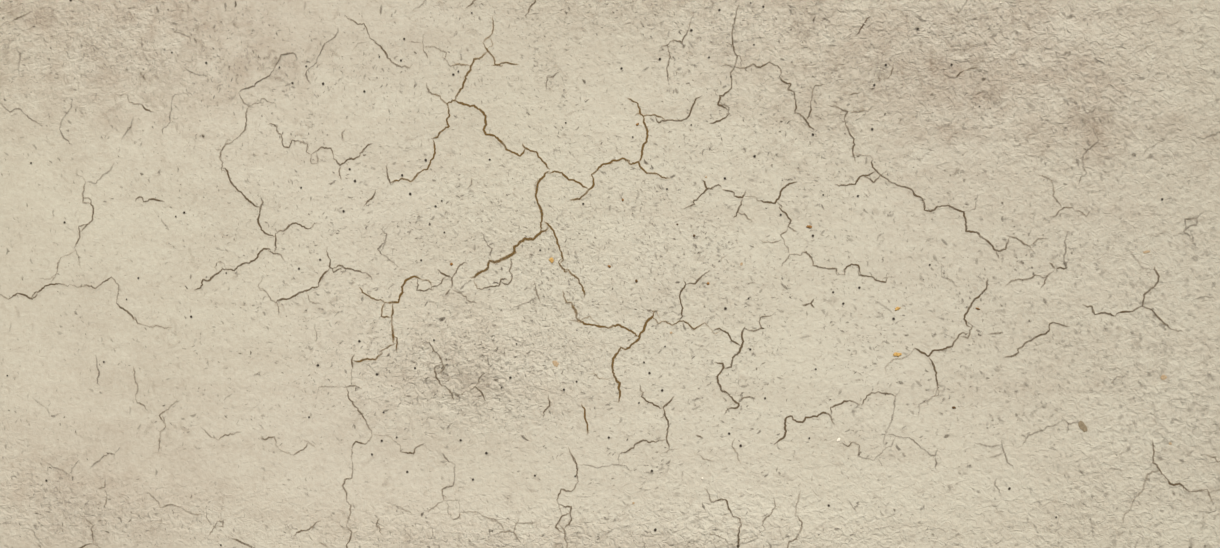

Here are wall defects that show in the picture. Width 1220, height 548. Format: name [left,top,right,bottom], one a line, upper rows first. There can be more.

crack [8,199,139,324]
crack [194,0,894,454]
crack [838,93,1168,389]
crack [401,442,447,492]
crack [555,403,590,530]
crack [1150,439,1210,495]
crack [77,533,93,548]
crack [220,521,256,548]
crack [293,476,355,548]
crack [710,499,803,548]